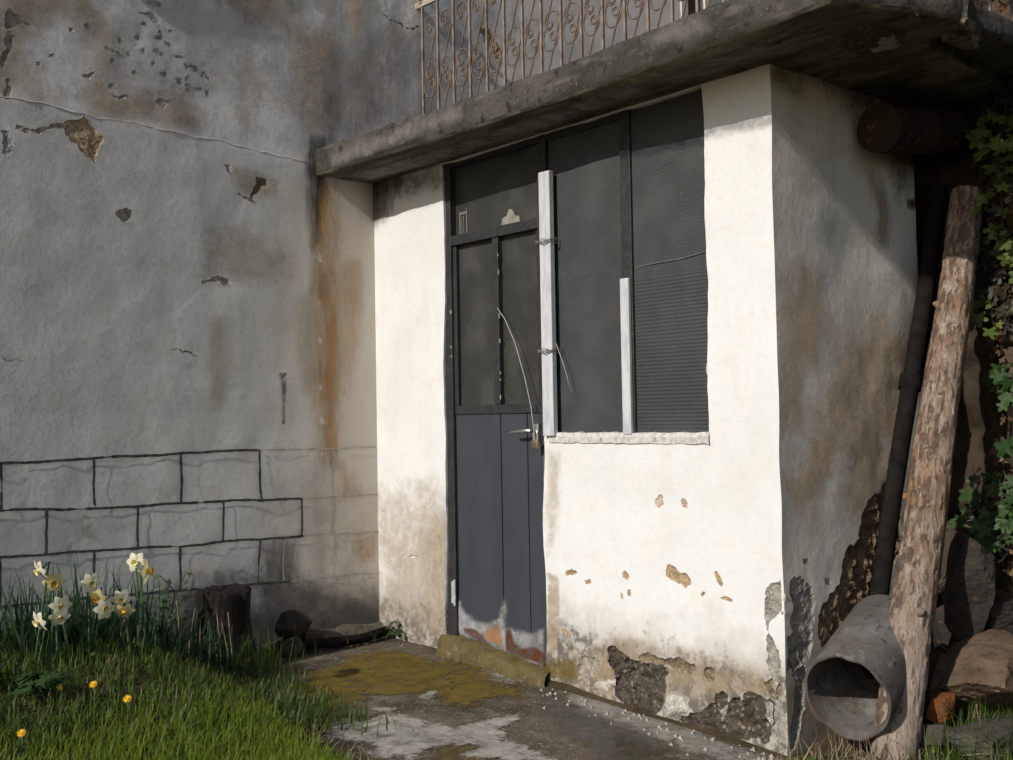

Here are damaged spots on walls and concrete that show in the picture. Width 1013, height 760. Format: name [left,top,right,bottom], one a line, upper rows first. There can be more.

spalling [0,8,29,100]
peeling [104,0,210,97]
peeling [1,115,104,162]
spalling [238,176,273,205]
damp [308,139,327,242]
damp [789,315,907,512]
damp [251,572,380,648]
damp [379,502,446,630]
corrosion [464,628,545,664]
spalling [578,480,886,751]